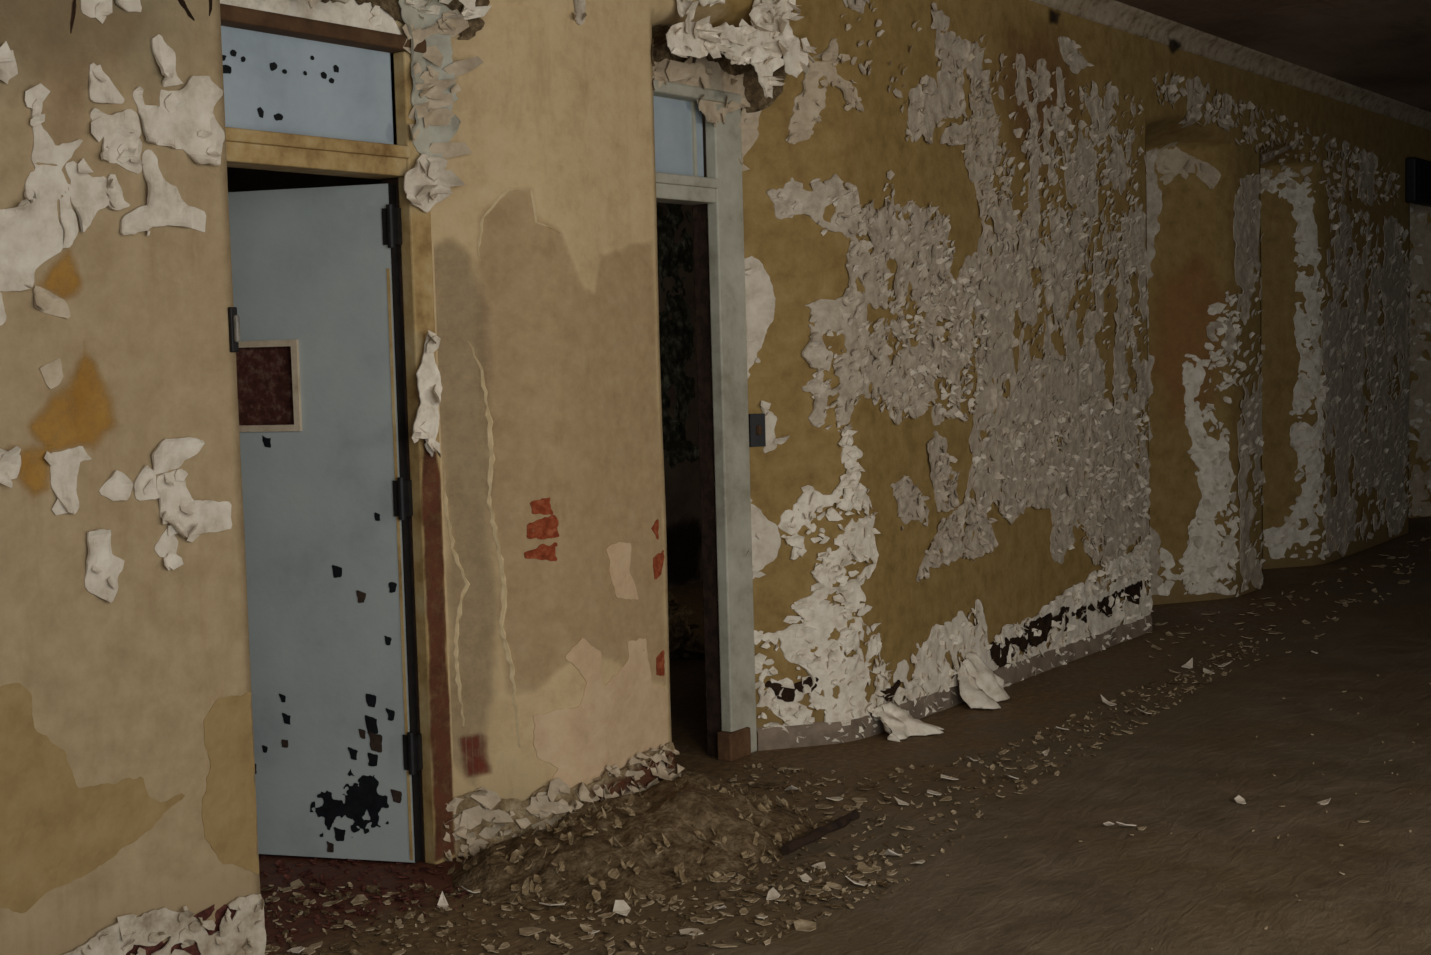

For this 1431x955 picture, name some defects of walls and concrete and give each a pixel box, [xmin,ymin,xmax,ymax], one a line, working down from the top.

peeling [80,0,142,24]
peeling [0,34,246,326]
peeling [220,0,491,213]
peeling [651,0,1431,743]
peeling [44,446,92,515]
peeling [84,529,124,603]
peeling [98,437,232,571]
spalling [523,497,559,561]
peeling [0,683,185,913]
peeling [202,692,291,875]
peeling [443,638,685,862]
spalling [63,894,266,955]